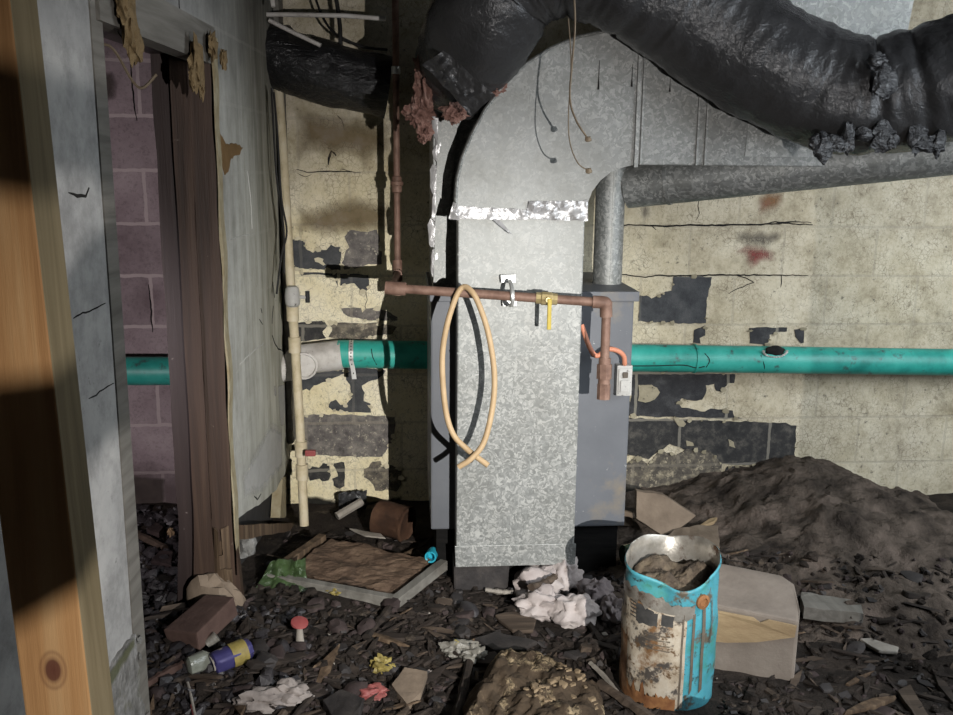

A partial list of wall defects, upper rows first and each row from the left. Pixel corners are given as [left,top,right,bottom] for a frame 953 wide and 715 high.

leakage [306,120,384,153]
leakage [306,203,385,229]
crack [624,201,813,230]
peeling [293,230,386,294]
peeling [298,306,397,343]
peeling [638,274,712,344]
peeling [748,327,807,358]
peeling [302,368,405,492]
peeling [626,372,797,489]